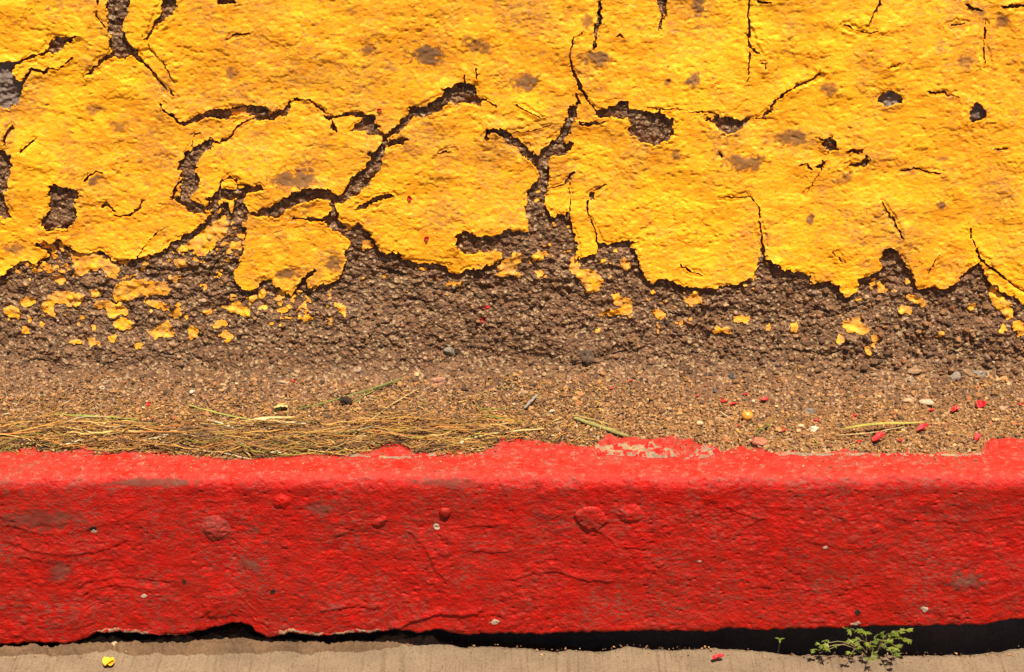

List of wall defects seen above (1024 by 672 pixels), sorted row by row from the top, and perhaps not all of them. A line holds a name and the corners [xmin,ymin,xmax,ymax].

crack [746,0,772,81]
crack [951,4,1024,63]
peeling [0,125,15,219]
crack [139,0,625,254]
peeling [595,100,687,147]
peeling [815,136,871,168]
peeling [877,90,902,107]
peeling [969,102,986,123]
crack [102,200,144,216]
crack [882,201,904,239]
peeling [0,184,1024,386]
crack [970,228,1024,292]